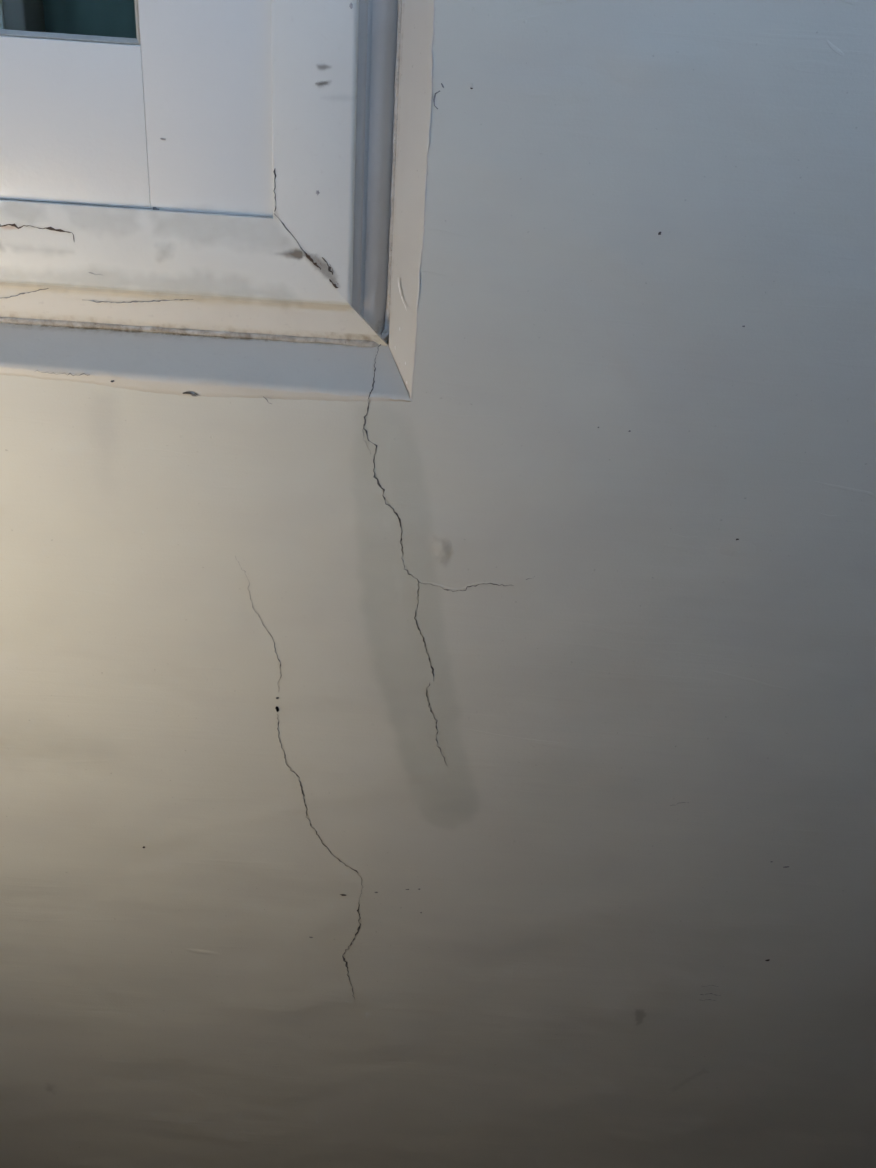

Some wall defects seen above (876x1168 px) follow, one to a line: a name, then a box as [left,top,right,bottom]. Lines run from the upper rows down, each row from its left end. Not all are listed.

crack [363,344,535,763]
crack [239,564,363,997]